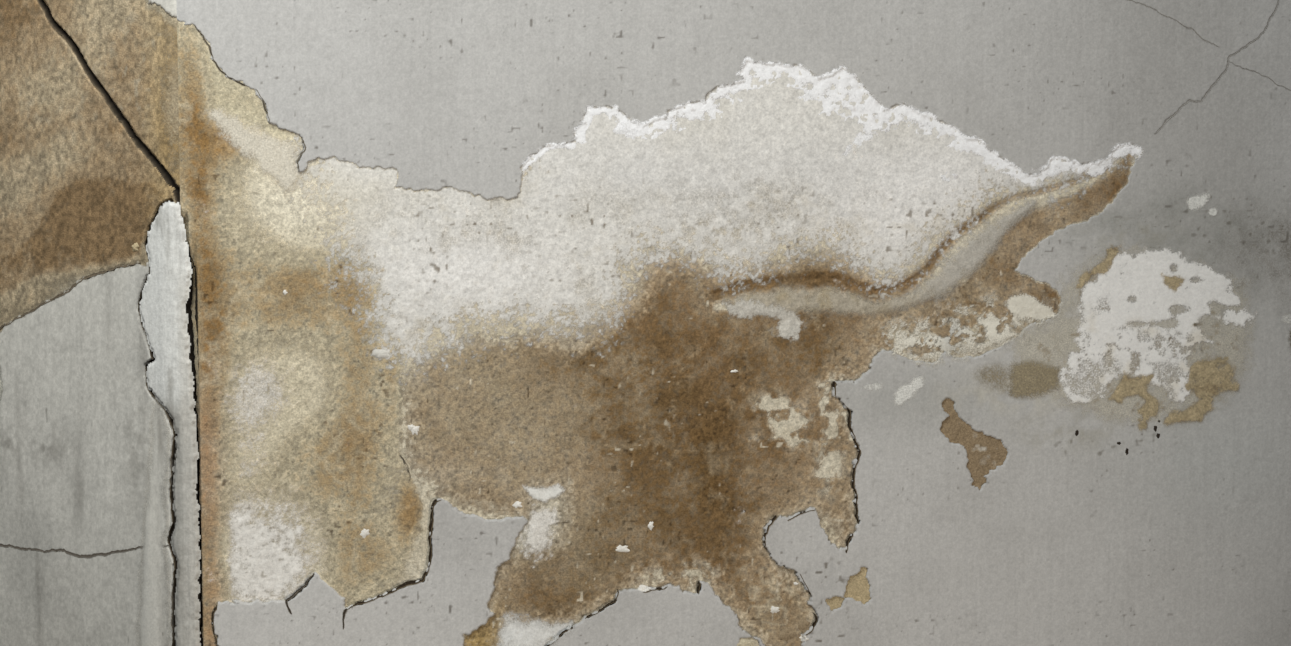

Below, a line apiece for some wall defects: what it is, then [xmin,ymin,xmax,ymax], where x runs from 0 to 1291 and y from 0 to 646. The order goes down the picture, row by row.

damp [0,0,180,321]
spalling [0,196,351,646]
spalling [145,0,549,284]
damp [177,21,1143,646]
peeling [364,154,1257,646]
crack [1132,0,1291,134]